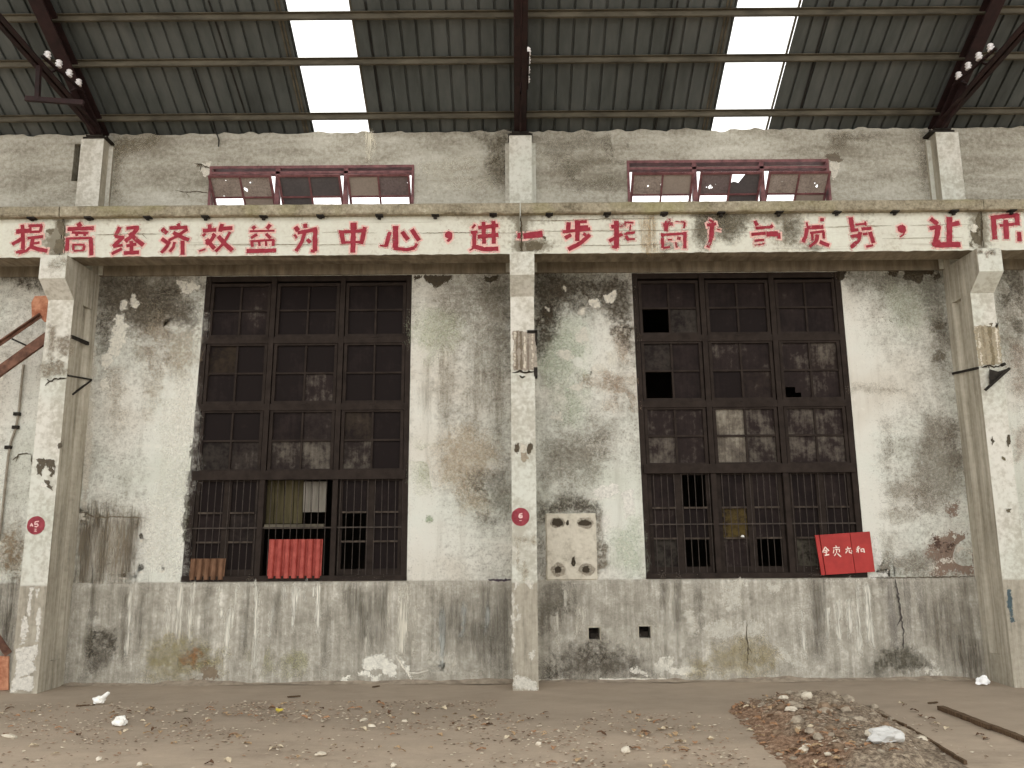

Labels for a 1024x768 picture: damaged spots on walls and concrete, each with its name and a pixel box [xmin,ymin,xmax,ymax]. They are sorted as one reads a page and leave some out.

water stain [98,276,195,352]
flaking render [556,290,617,361]
spalling [36,441,62,490]
water stain [75,510,139,583]
water stain [578,506,608,574]
flaking render [922,499,975,578]
water stain [89,590,133,669]
water stain [164,583,196,651]
water stain [254,580,320,666]
flaking render [341,651,411,681]
water stain [538,644,702,680]
crack [871,576,975,648]